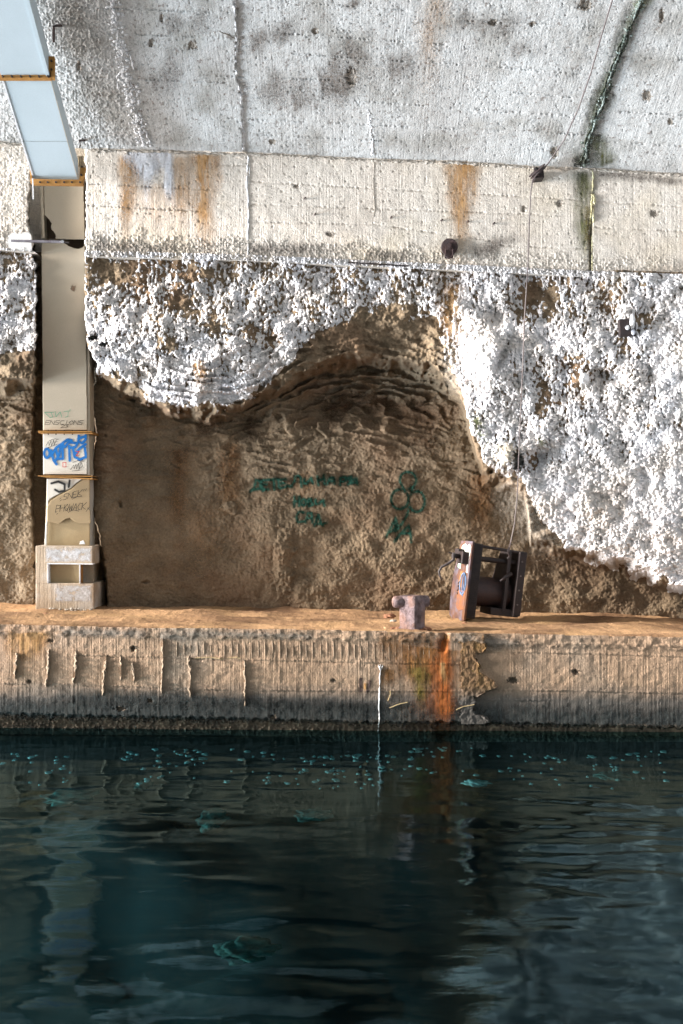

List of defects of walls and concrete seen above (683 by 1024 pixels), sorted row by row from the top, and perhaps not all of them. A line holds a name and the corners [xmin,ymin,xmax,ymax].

leakage [573,0,681,186]
rust [121,158,139,219]
rust [176,155,211,224]
rust [454,162,475,230]
efflorescence [0,247,38,354]
leakage [85,240,683,594]
spalling [0,633,683,732]
rust [436,635,450,718]